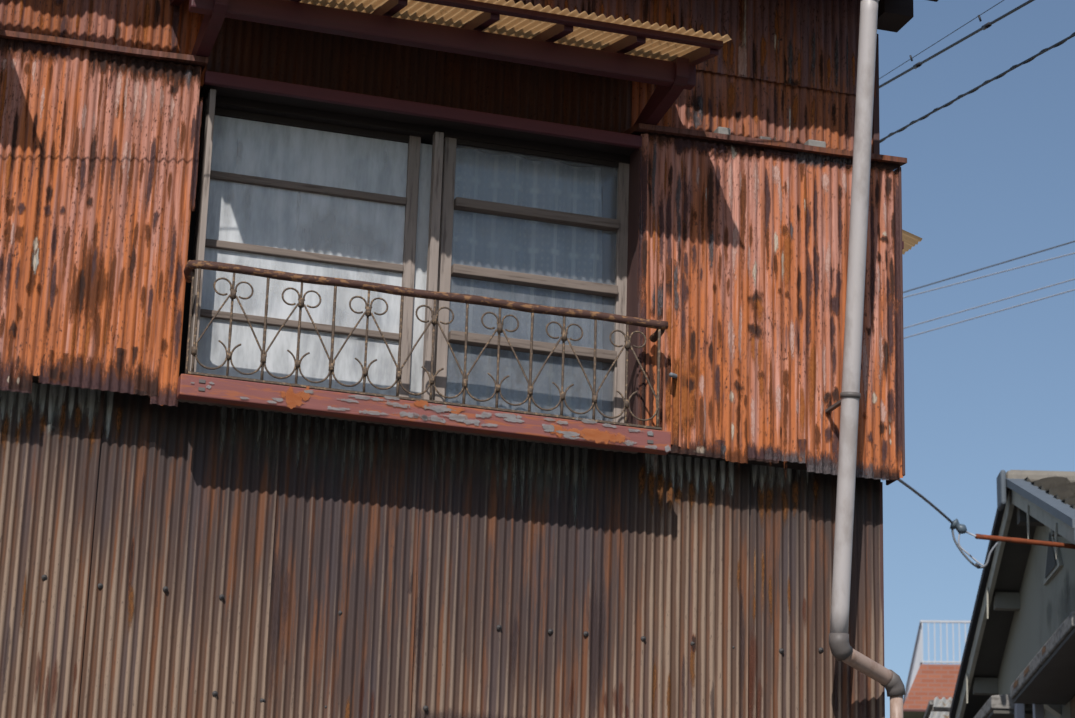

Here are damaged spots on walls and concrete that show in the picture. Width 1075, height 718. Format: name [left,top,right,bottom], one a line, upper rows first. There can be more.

corrosion [557,0,604,15]
corrosion [643,0,704,33]
corrosion [0,0,202,452]
corrosion [637,10,855,504]
corrosion [856,161,904,481]
peeling [267,385,314,409]
peeling [327,395,524,427]
peeling [542,417,671,452]
corrosion [639,458,695,514]
corrosion [345,679,374,718]
corrosion [652,664,671,718]
corrosion [748,640,761,718]